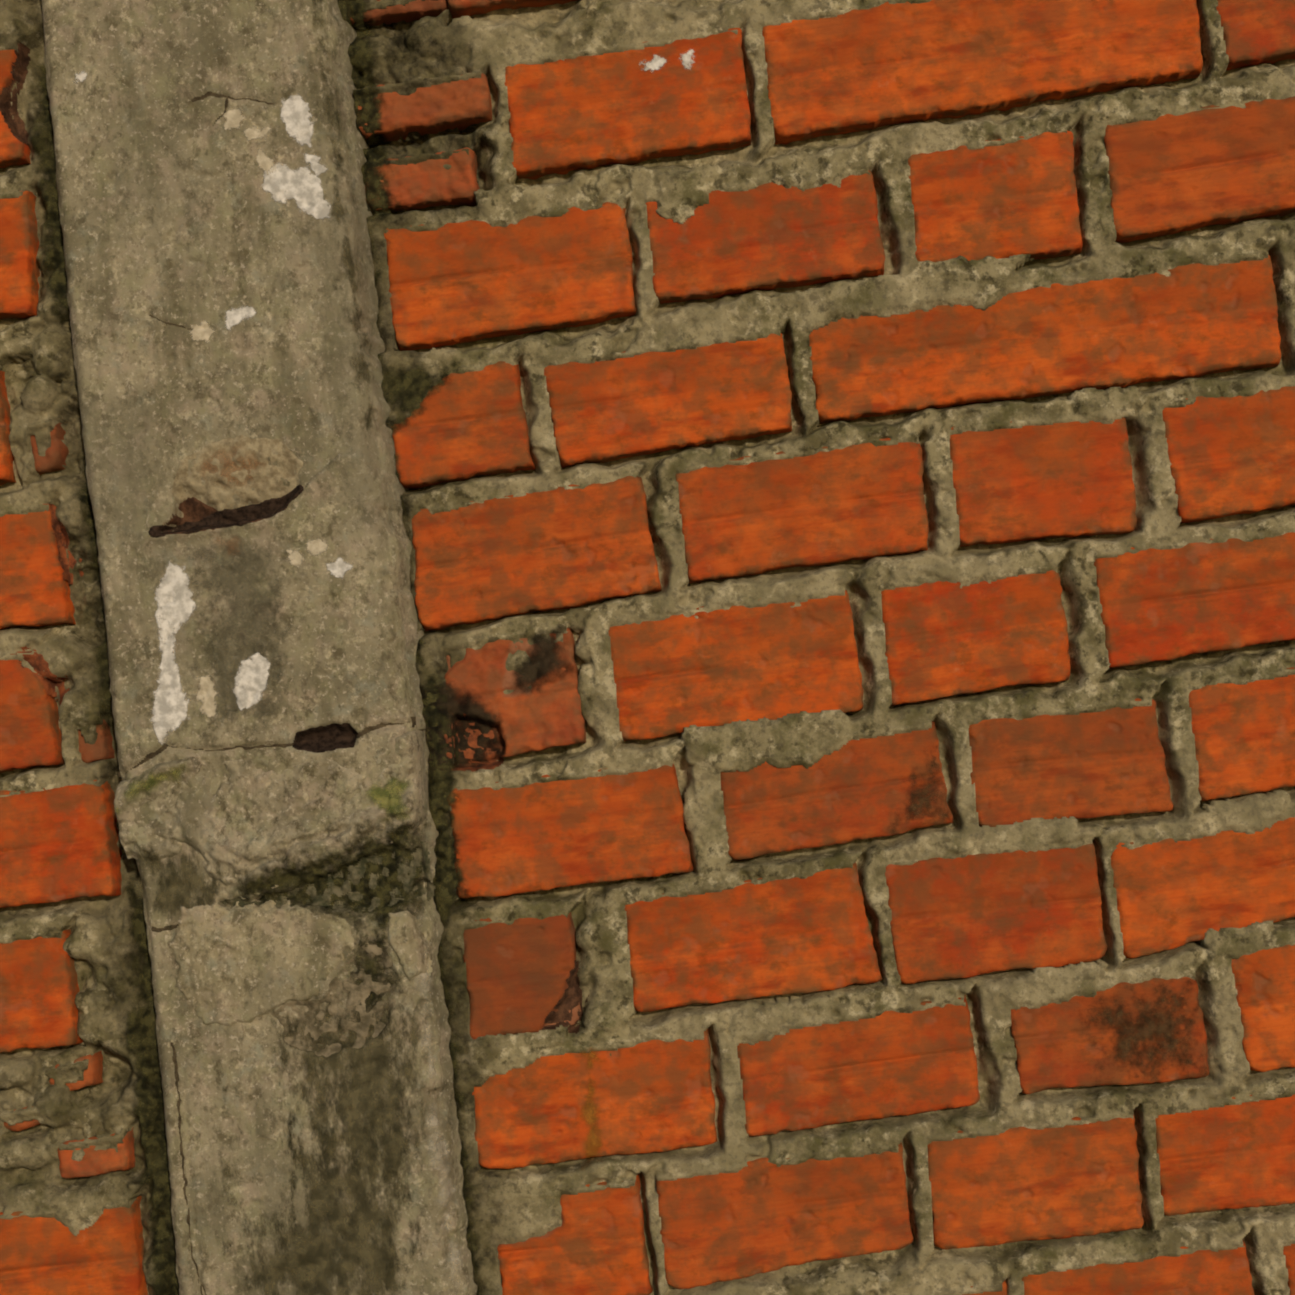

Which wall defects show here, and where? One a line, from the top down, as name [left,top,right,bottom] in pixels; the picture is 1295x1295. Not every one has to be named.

spalling [148,435,308,538]
crack [118,717,416,777]
spalling [444,721,506,772]